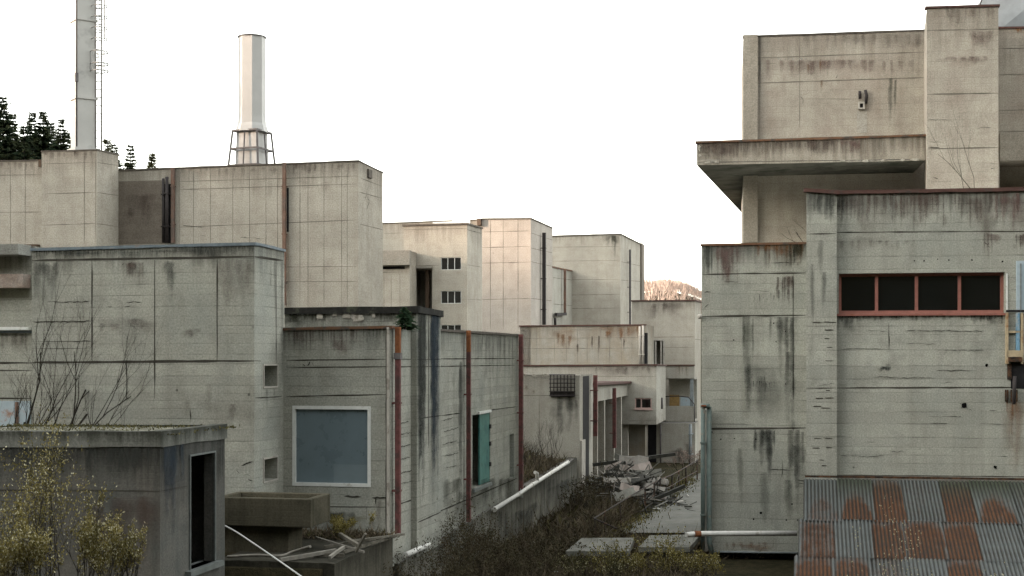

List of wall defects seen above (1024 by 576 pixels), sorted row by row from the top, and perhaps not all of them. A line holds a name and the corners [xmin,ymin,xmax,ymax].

leakage [412,313,439,446]